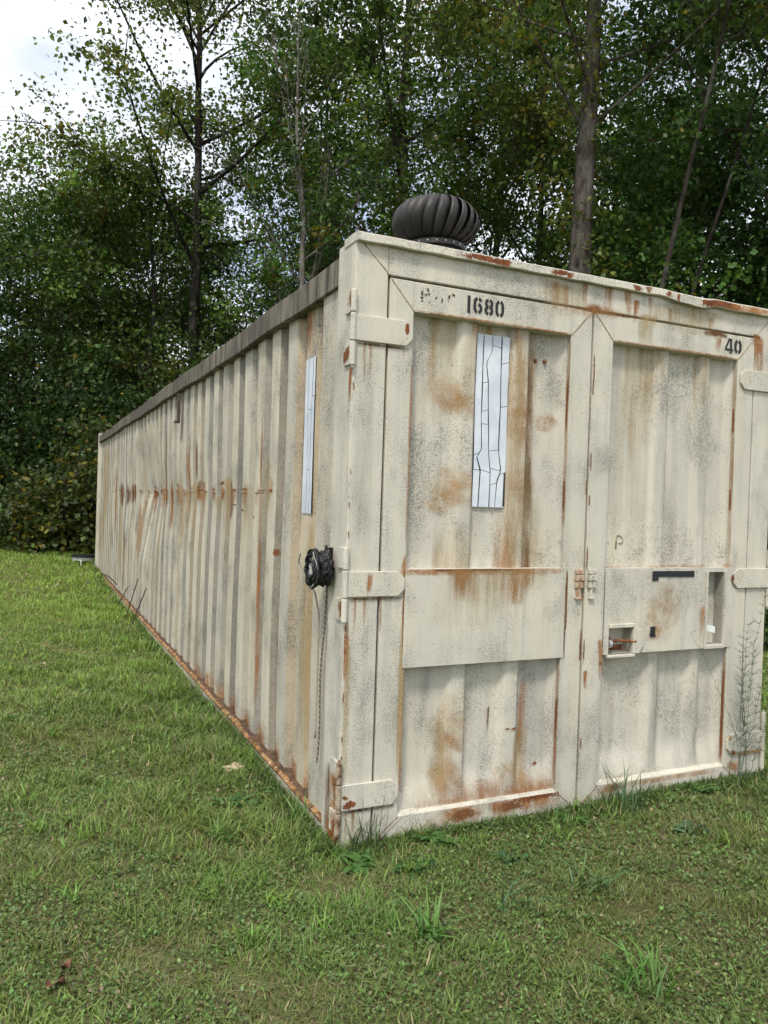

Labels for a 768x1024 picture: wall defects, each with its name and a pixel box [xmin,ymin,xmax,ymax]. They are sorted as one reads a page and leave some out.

rust [583,284,652,318]
rust [690,299,767,315]
rust [343,343,402,394]
rust [429,312,567,507]
rust [99,435,272,578]
rust [402,530,539,601]
rust [338,576,405,784]
rust [433,693,559,823]
rust [324,766,392,847]